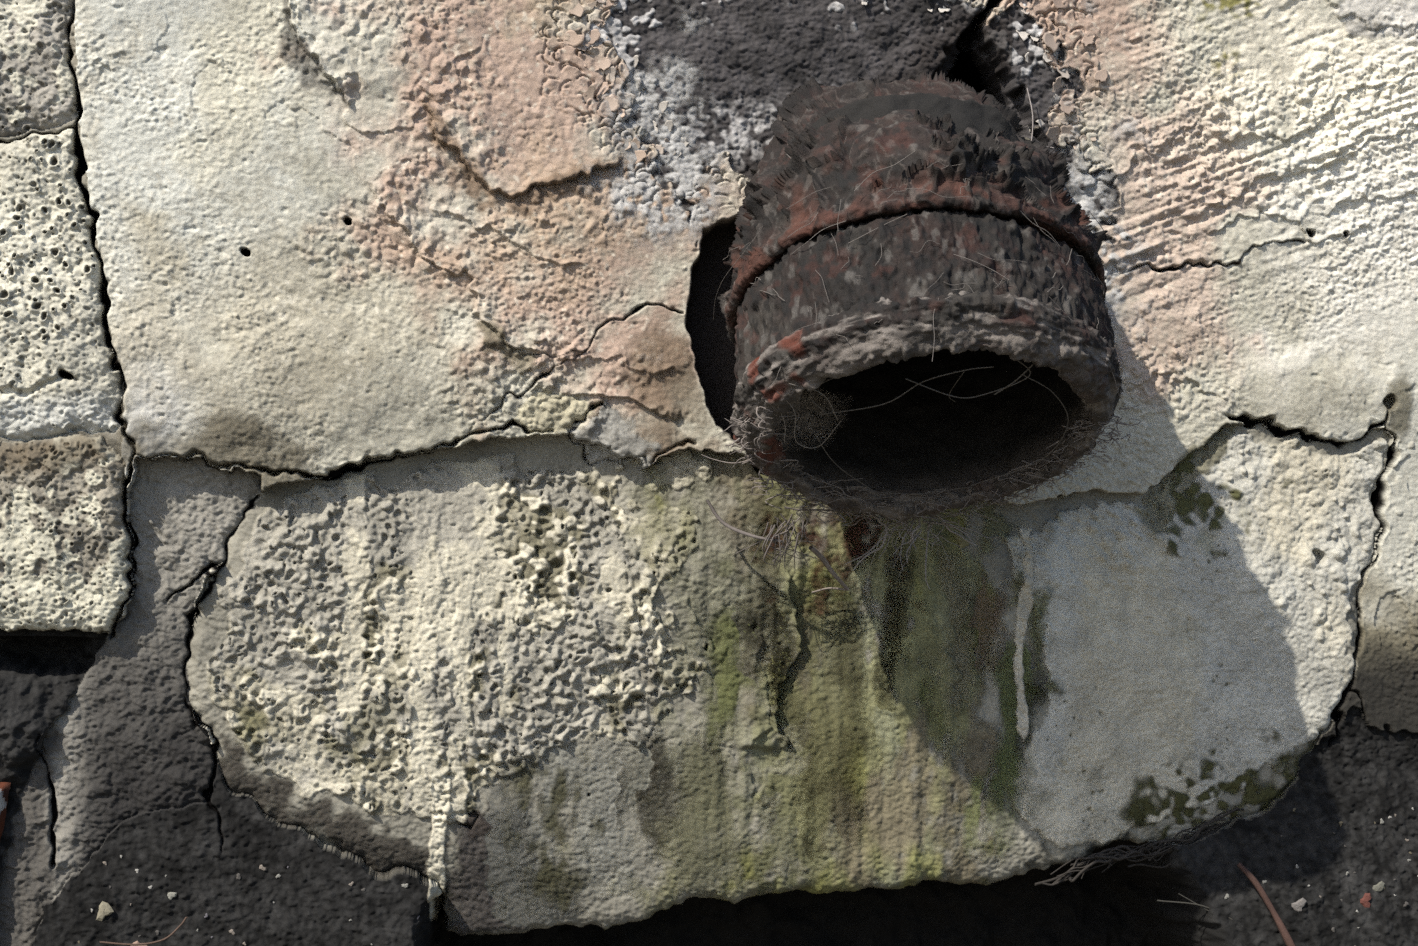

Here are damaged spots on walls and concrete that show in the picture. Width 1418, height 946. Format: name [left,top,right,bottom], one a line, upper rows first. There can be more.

spalling [281,0,346,104]
peeling [425,0,1120,243]
crack [1117,239,1305,276]
crack [0,16,680,865]
crack [651,440,693,464]
leakage [684,607,763,868]
leakage [967,597,1047,833]
peeling [1005,423,1388,848]
crack [1228,414,1395,723]
peeling [91,886,114,921]
peeling [1291,898,1306,912]